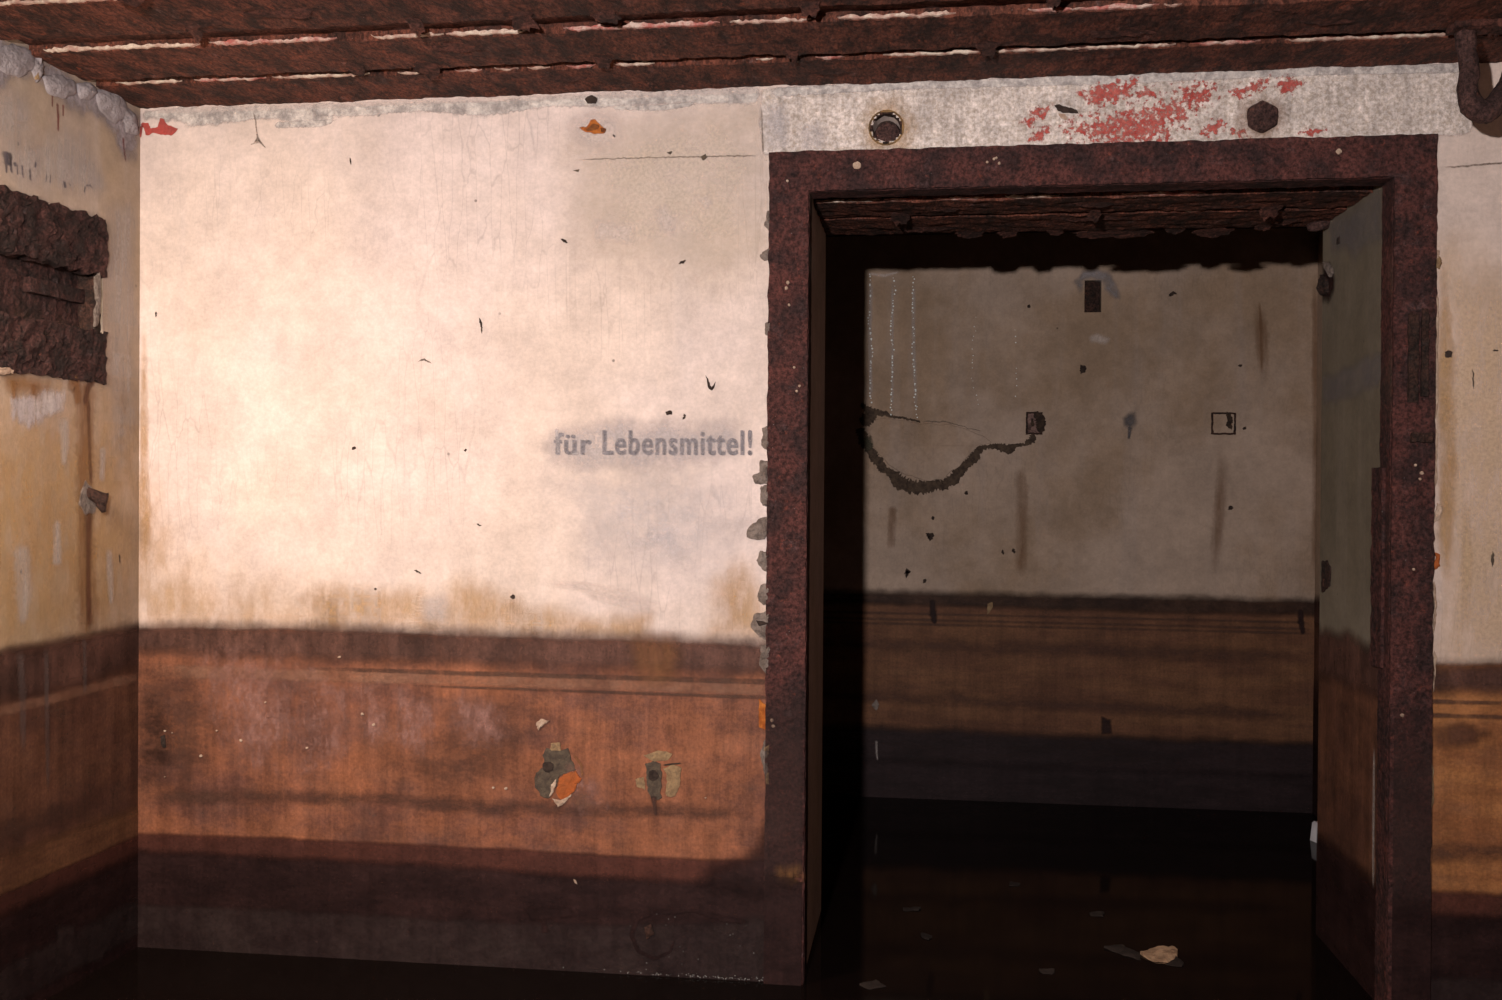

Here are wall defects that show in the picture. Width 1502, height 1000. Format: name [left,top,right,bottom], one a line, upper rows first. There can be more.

peeling [0,40,1473,156]
spalling [760,211,770,261]
corrosion [1047,209,1235,239]
corrosion [1316,262,1334,301]
corrosion [80,381,103,490]
corrosion [81,510,92,631]
spalling [746,426,770,673]
corrosion [1321,560,1331,592]
damp [0,626,766,1000]
spalling [534,742,582,807]
spalling [635,751,682,815]
damp [1430,664,1502,1000]